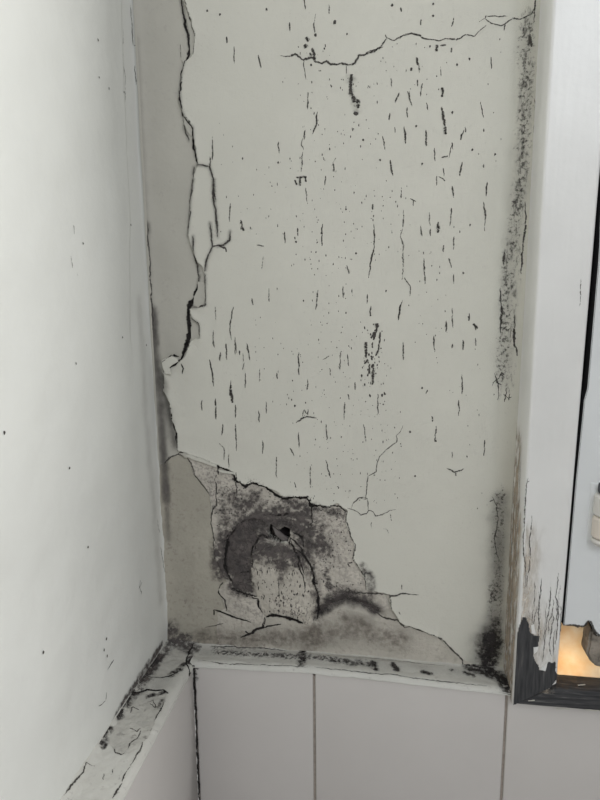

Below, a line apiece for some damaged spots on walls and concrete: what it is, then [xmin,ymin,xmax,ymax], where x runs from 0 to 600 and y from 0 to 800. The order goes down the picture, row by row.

crack [280,0,536,169]
damp [494,1,536,402]
crack [64,0,483,798]
peeling [133,0,471,679]
peeling [106,691,167,754]
damp [211,483,380,671]
crack [506,462,562,678]
peeling [513,617,558,705]